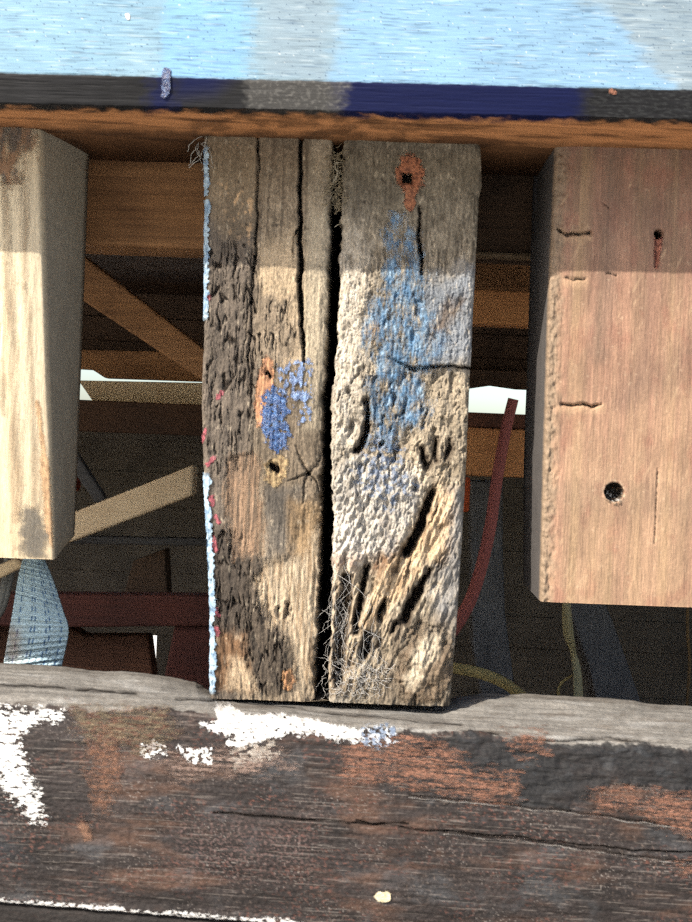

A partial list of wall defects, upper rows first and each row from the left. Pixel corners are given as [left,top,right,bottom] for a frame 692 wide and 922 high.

rust [395,153,425,212]
rust [654,237,663,269]
crack [207,141,305,465]
crack [390,358,470,371]
crack [294,147,343,715]
crack [219,531,294,708]
crack [214,812,316,821]
crack [408,795,673,828]
crack [399,823,692,863]